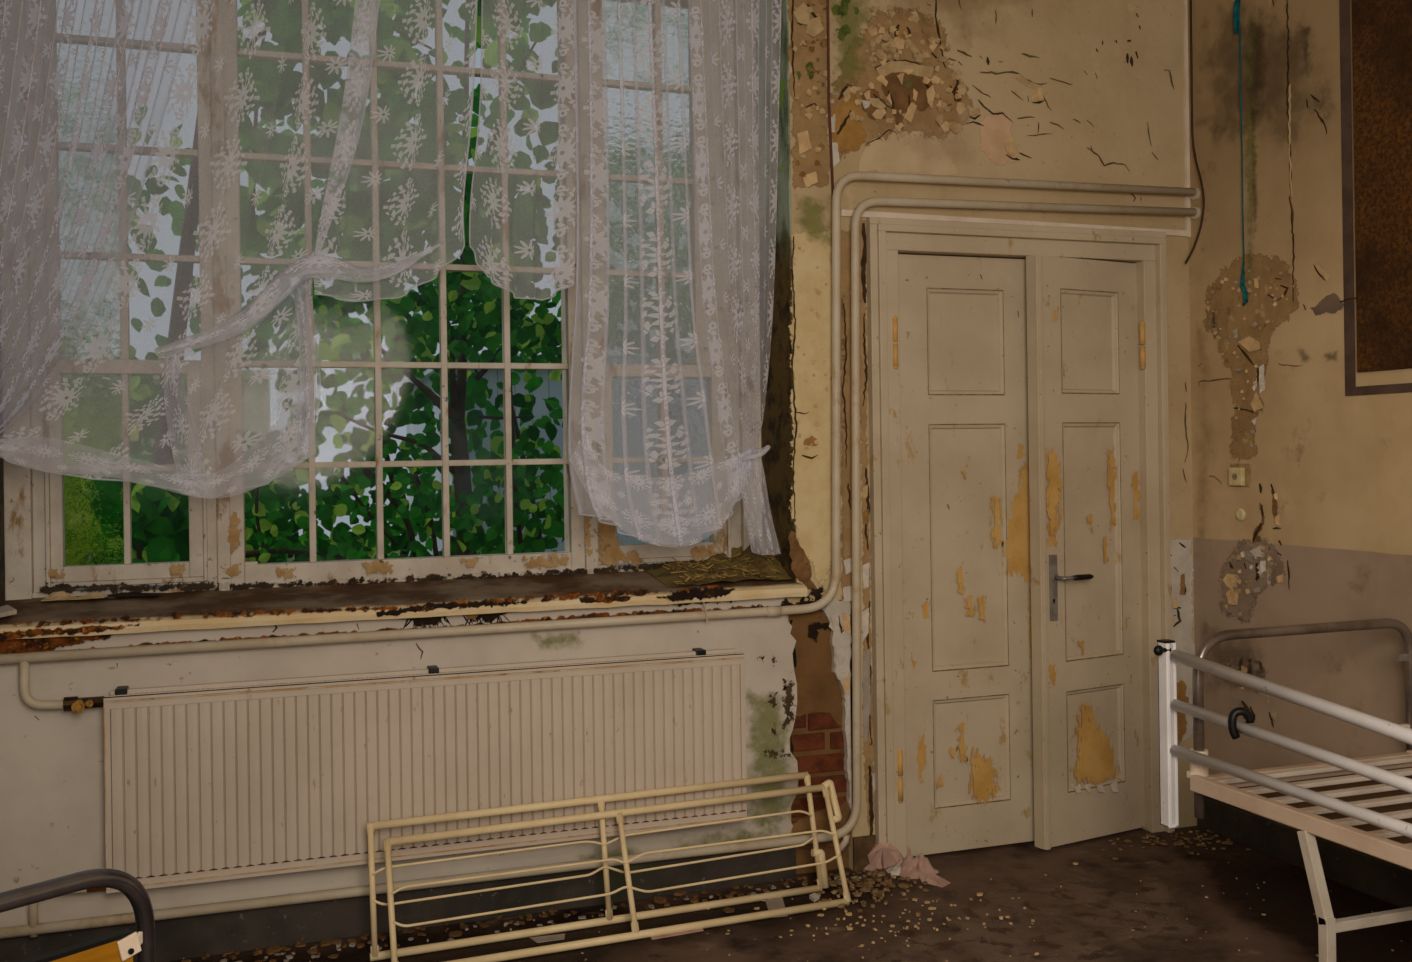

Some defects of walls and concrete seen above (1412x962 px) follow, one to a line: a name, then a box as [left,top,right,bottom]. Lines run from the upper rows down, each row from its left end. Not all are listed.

peeling [787,0,1031,189]
crack [921,0,1158,202]
peeling [1203,253,1299,464]
rust [13,612,182,628]
rust [129,630,357,646]
rust [203,585,763,631]
leakage [757,655,796,760]
peeling [781,220,875,874]
peeling [949,722,1003,805]
peeling [989,443,1064,659]
peeling [1071,702,1121,793]
peeling [1219,483,1290,623]